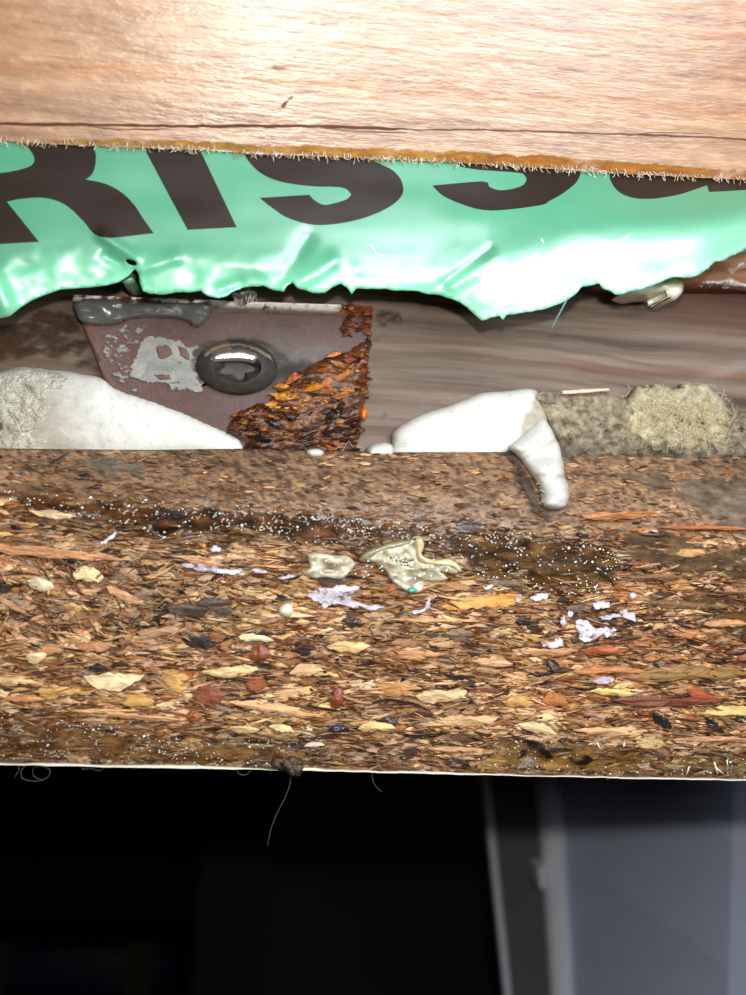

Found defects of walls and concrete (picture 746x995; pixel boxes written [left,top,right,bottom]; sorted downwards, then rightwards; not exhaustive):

crack [0,122,746,140]
rust [227,304,374,451]
water stain [76,503,351,539]
water stain [436,537,618,586]
water stain [726,613,746,630]